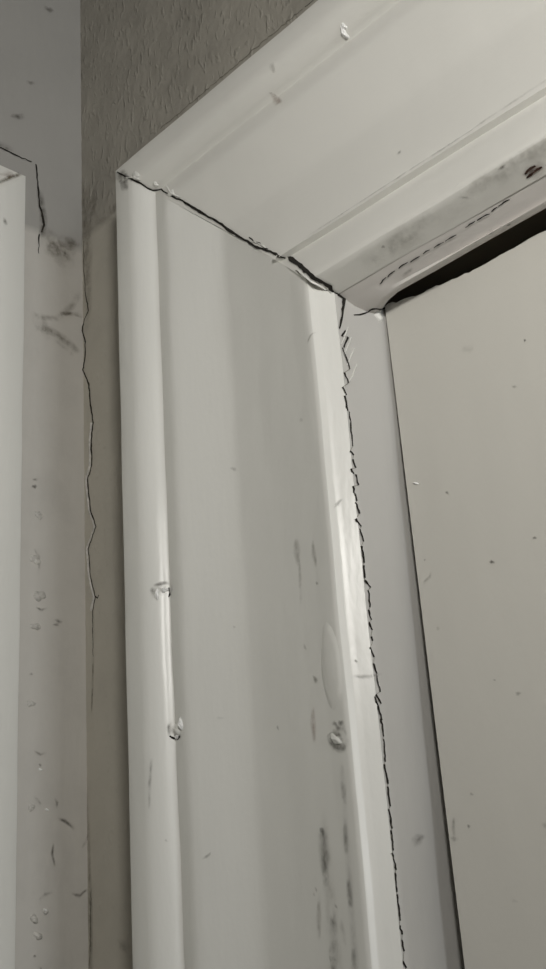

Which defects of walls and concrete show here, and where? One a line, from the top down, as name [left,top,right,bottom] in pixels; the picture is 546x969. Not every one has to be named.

crack [0,147,45,253]
crack [380,199,510,284]
crack [67,246,99,651]
crack [117,171,407,968]